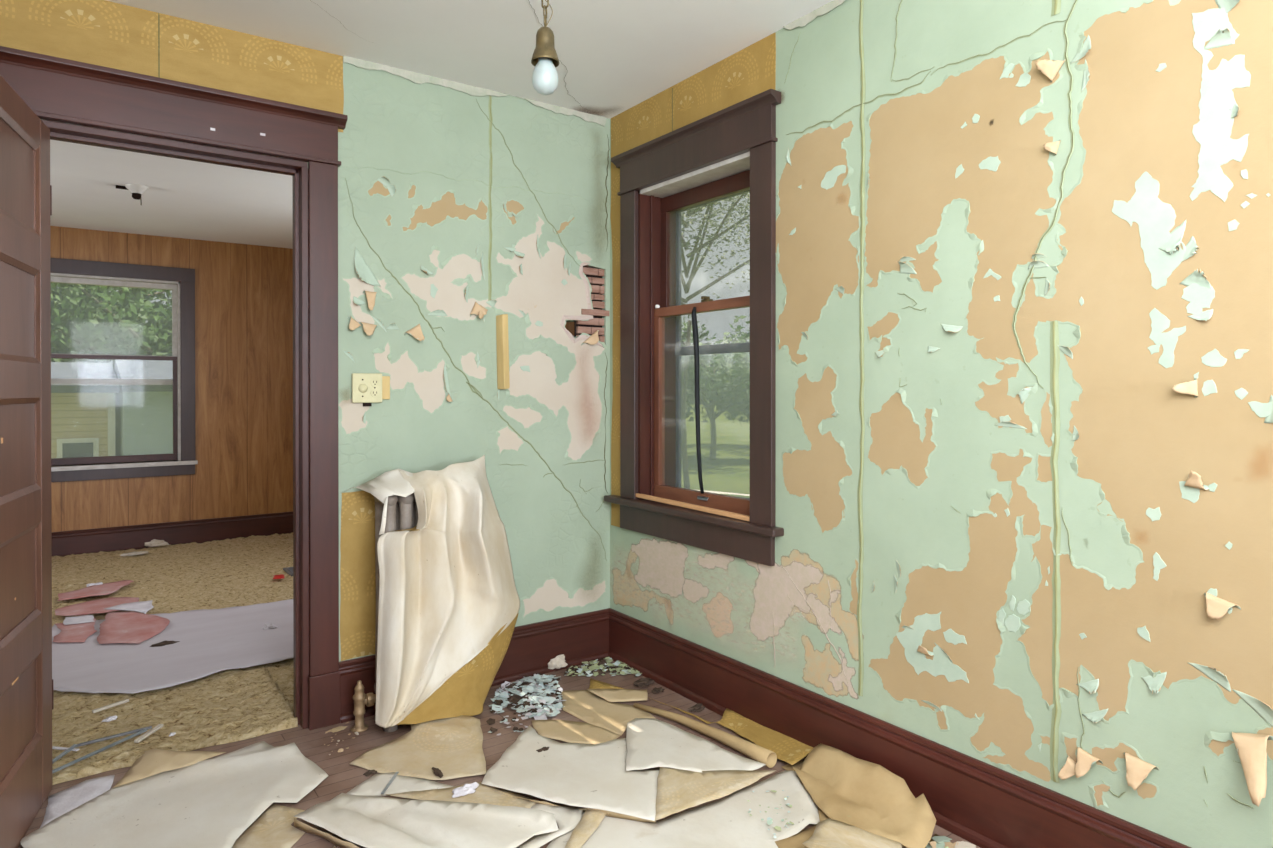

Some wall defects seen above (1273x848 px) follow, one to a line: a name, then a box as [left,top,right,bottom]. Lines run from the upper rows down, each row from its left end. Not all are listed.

peeling [338,176,609,461]
crack [345,178,608,561]
crack [476,99,581,267]
crack [559,60,610,250]
peeling [521,0,1273,811]
crack [786,0,1078,388]
crack [1061,507,1073,566]
crack [1077,667,1085,749]